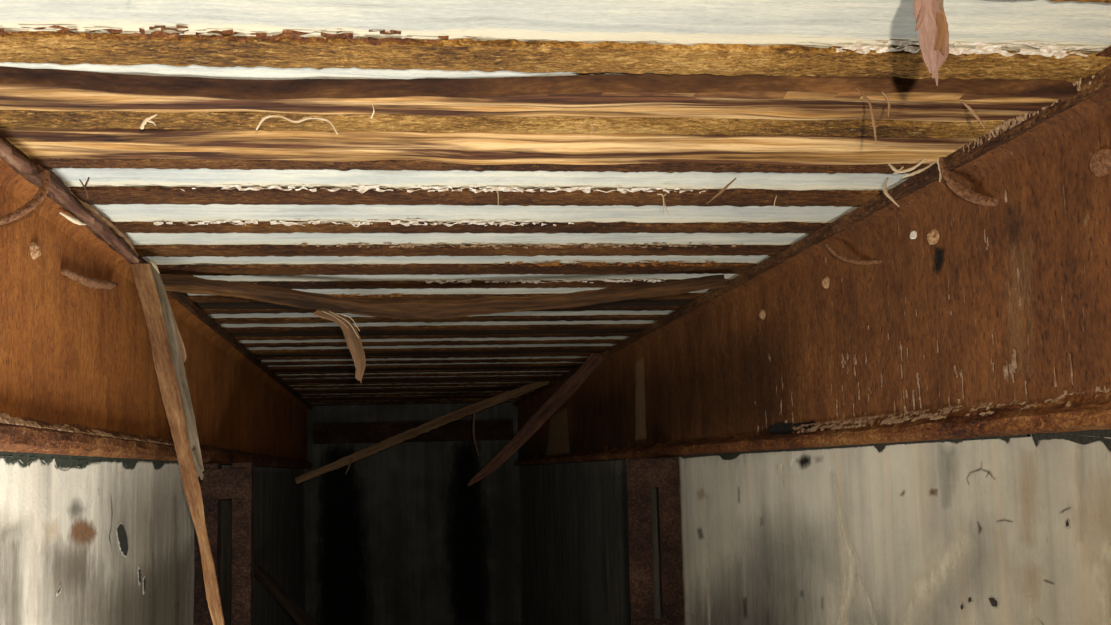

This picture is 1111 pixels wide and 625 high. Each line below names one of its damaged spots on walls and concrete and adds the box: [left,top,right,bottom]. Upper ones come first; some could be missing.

peeling [829,352,883,424]
peeling [888,333,922,414]
peeling [991,331,1027,400]
rust [769,421,816,435]
rust [71,521,95,544]